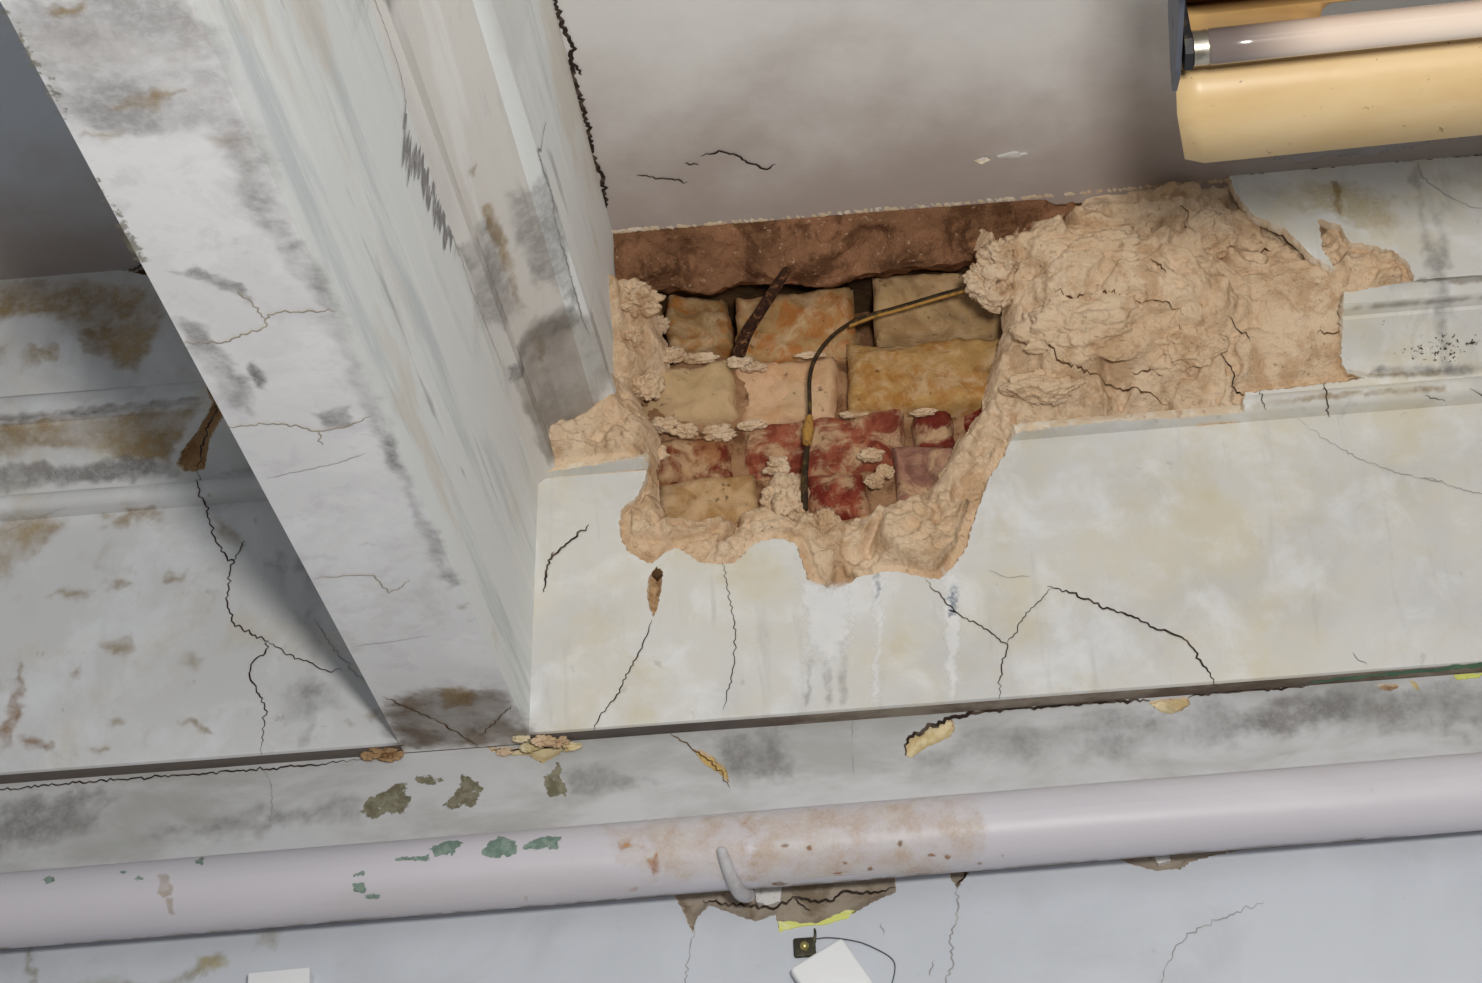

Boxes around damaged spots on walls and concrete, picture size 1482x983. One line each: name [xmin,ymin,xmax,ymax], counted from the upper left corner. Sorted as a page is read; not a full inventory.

crack [553,0,775,208]
damp [0,287,154,366]
damp [0,410,189,483]
spalling [176,385,223,472]
spalling [546,176,1414,617]
crack [543,525,588,592]
crack [0,472,511,823]
crack [904,571,1309,755]
damp [388,693,532,747]
peeling [395,840,462,861]
peeling [481,836,561,858]
spalling [674,878,896,933]